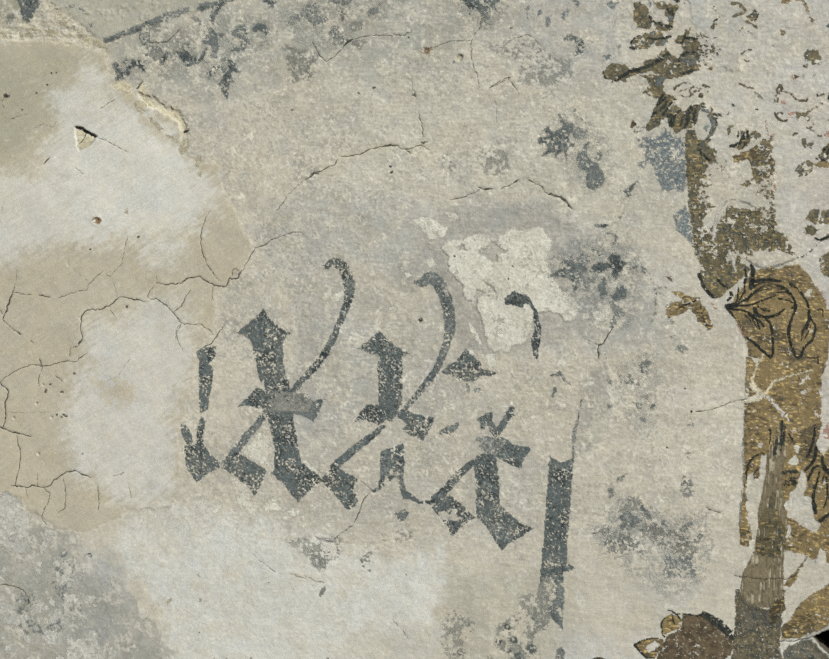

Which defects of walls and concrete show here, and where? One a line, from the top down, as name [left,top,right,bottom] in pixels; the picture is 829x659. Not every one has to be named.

flaking render [0,10,104,49]
crack [76,126,128,152]
flaking render [113,80,189,155]
peeling [412,211,605,368]
crack [0,219,303,525]